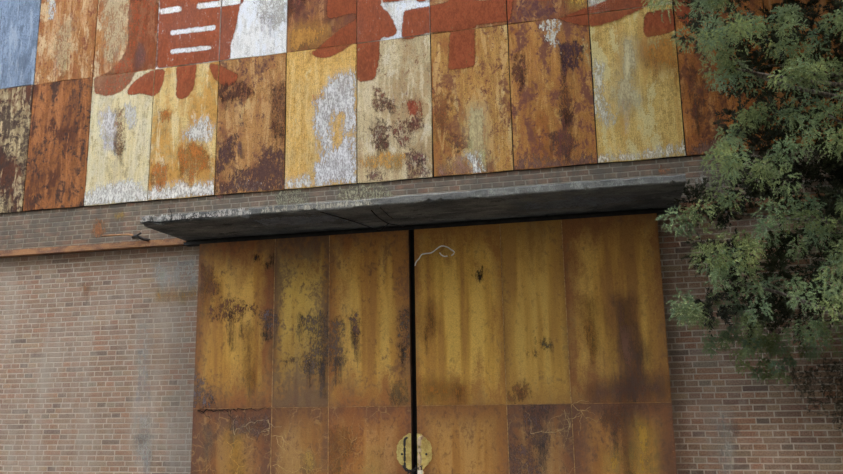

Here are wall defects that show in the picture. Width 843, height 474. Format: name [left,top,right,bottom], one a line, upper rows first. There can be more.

rust [512,51,528,85]
rust [558,40,584,72]
rust [113,109,126,158]
rust [150,163,168,192]
rust [178,142,209,186]
rust [215,80,287,194]
peeling [286,69,356,189]
rust [360,88,471,180]
rust [550,85,579,158]
rust [285,310,363,396]
crack [194,404,360,474]
crack [518,400,601,474]